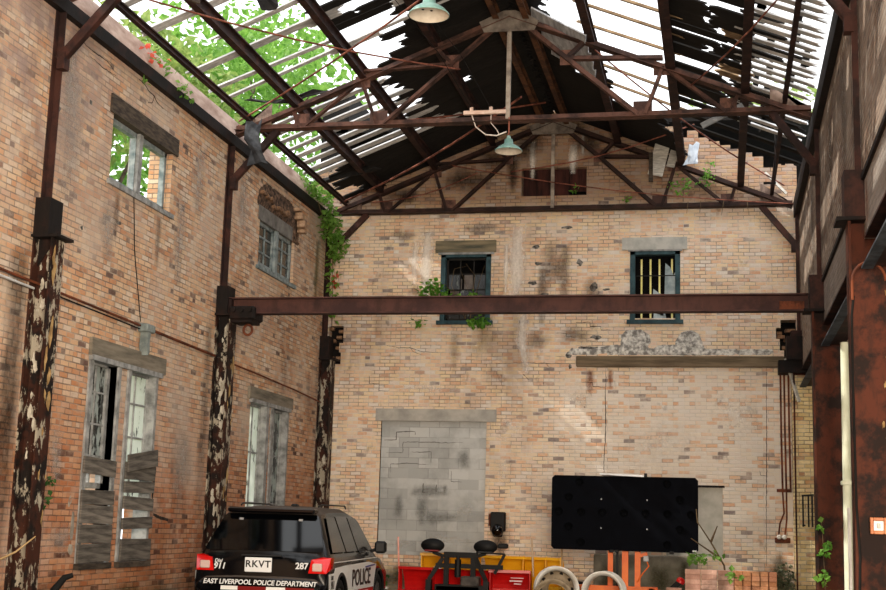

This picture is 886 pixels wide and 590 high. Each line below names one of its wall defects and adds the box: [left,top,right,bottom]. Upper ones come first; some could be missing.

peeling [36,245,57,315]
peeling [27,391,44,435]
peeling [32,317,53,411]
peeling [217,356,234,430]
spalling [566,329,774,369]
crack [386,431,463,493]
peeling [209,455,229,541]